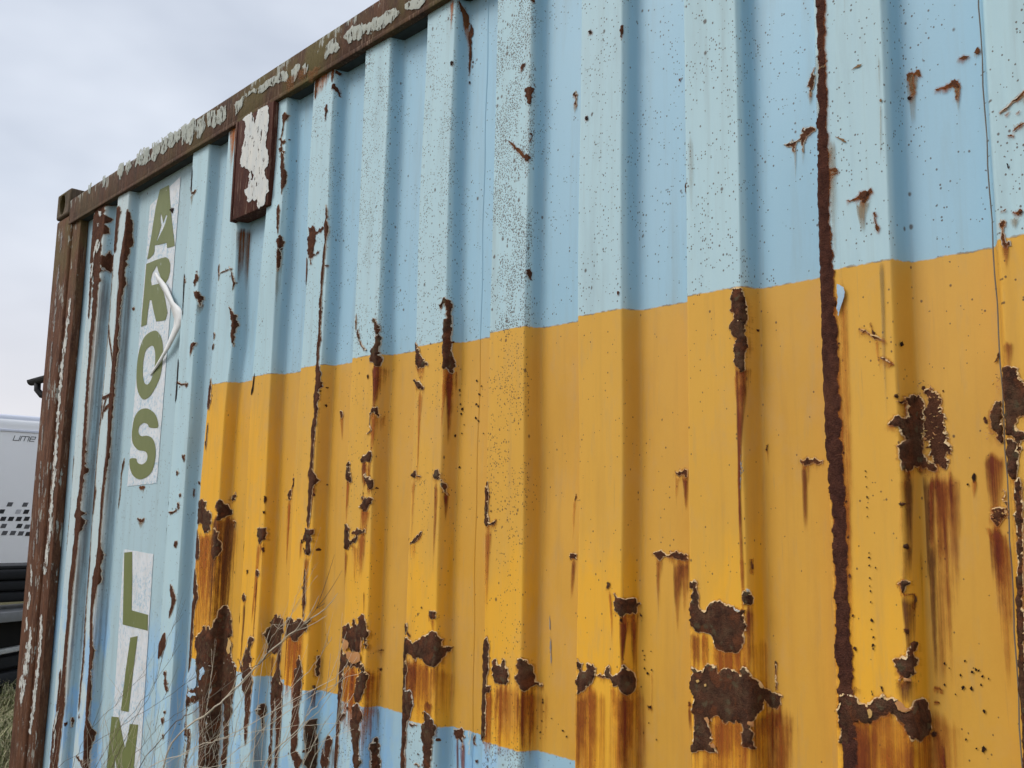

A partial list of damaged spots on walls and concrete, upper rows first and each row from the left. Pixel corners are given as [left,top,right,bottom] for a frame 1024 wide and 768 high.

peeling [324,0,425,58]
peeling [88,64,308,208]
rust [49,204,135,768]
rust [158,632,166,659]
rust [168,481,382,768]
rust [400,607,453,768]
rust [453,637,543,768]
rust [575,582,651,768]
rust [653,287,783,768]
rust [836,580,946,768]
rust [888,380,957,655]
rust [967,343,1024,768]